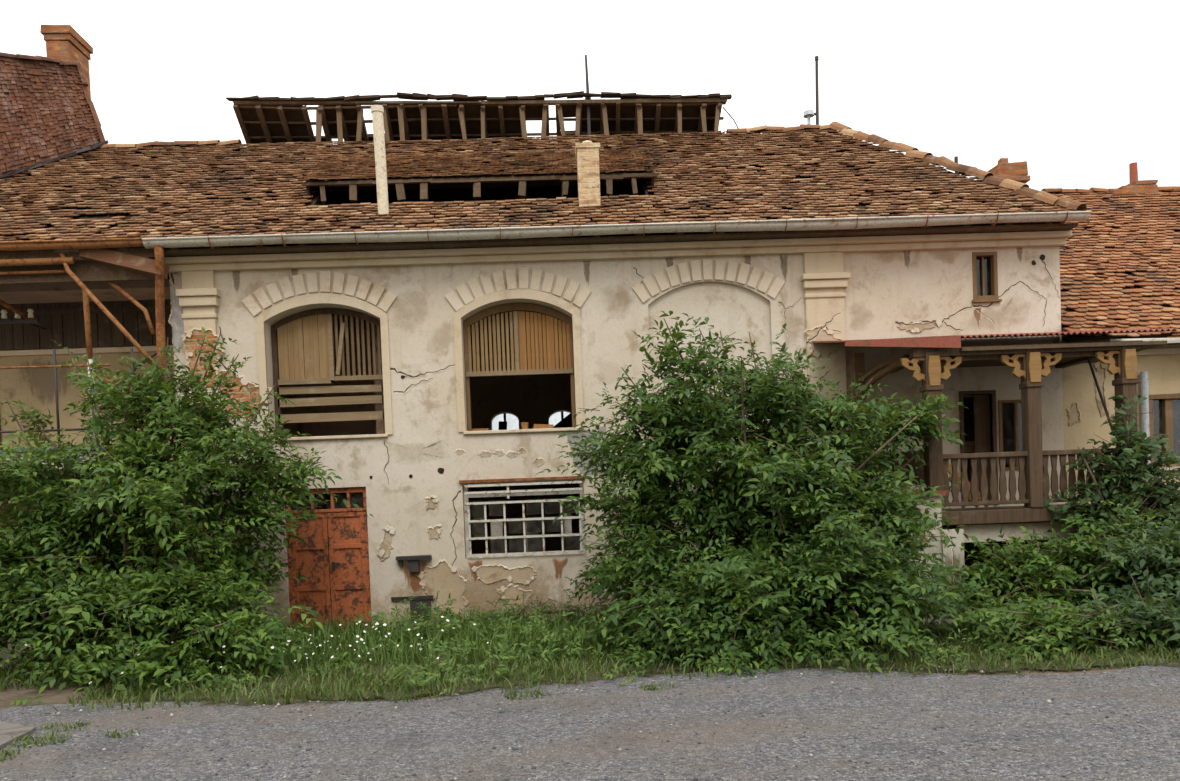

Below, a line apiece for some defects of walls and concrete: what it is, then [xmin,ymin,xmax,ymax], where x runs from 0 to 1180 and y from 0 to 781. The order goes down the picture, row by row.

crack [895,260,1060,332]
crack [390,365,455,395]
crack [448,489,461,569]
peeling [417,559,537,619]